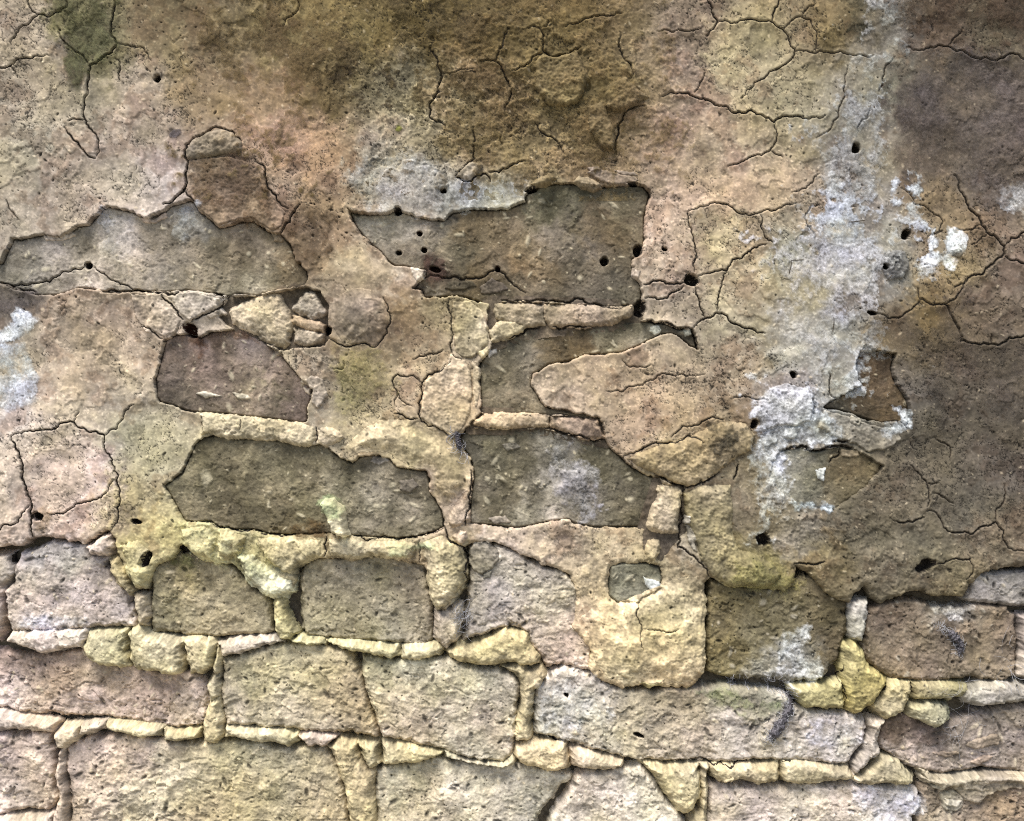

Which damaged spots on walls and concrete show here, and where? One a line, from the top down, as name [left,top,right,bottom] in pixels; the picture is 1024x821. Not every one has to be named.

crack [1,0,151,158]
crack [614,0,1024,166]
efflorescence [0,309,38,409]
crack [0,404,134,537]
spalling [0,157,328,422]
spalling [166,435,444,538]
spalling [351,166,697,528]
crack [392,175,817,439]
spalling [758,345,907,510]
damp [739,0,1024,520]
crack [884,175,1024,346]
spalling [608,562,662,602]